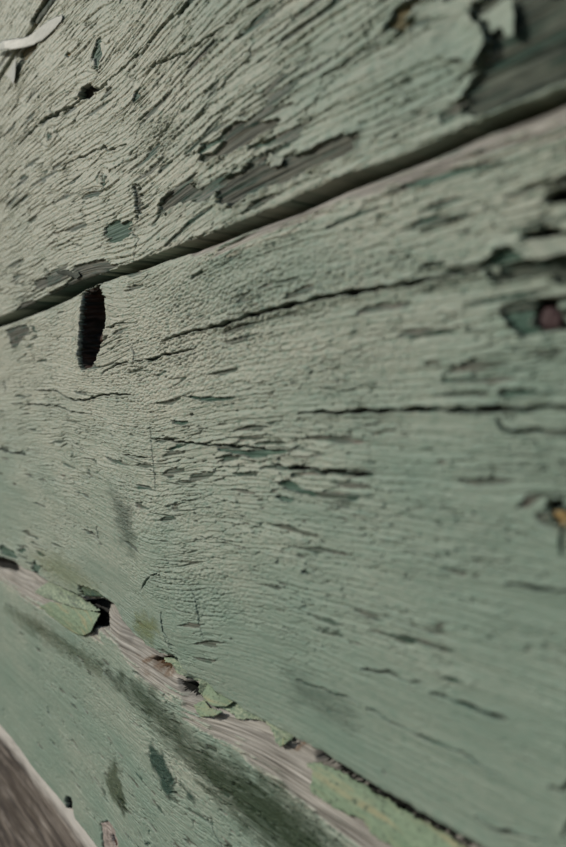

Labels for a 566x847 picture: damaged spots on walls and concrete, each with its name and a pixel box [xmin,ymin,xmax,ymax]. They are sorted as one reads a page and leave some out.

peeling [461,0,566,116]
crack [31,86,102,133]
peeling [199,118,359,208]
peeling [488,238,566,284]
crack [111,263,493,369]
crack [14,390,131,413]
crack [304,405,566,434]
crack [126,438,372,477]
peeling [35,581,103,636]
peeling [164,656,294,747]
crack [366,668,506,719]
peeling [306,762,465,847]